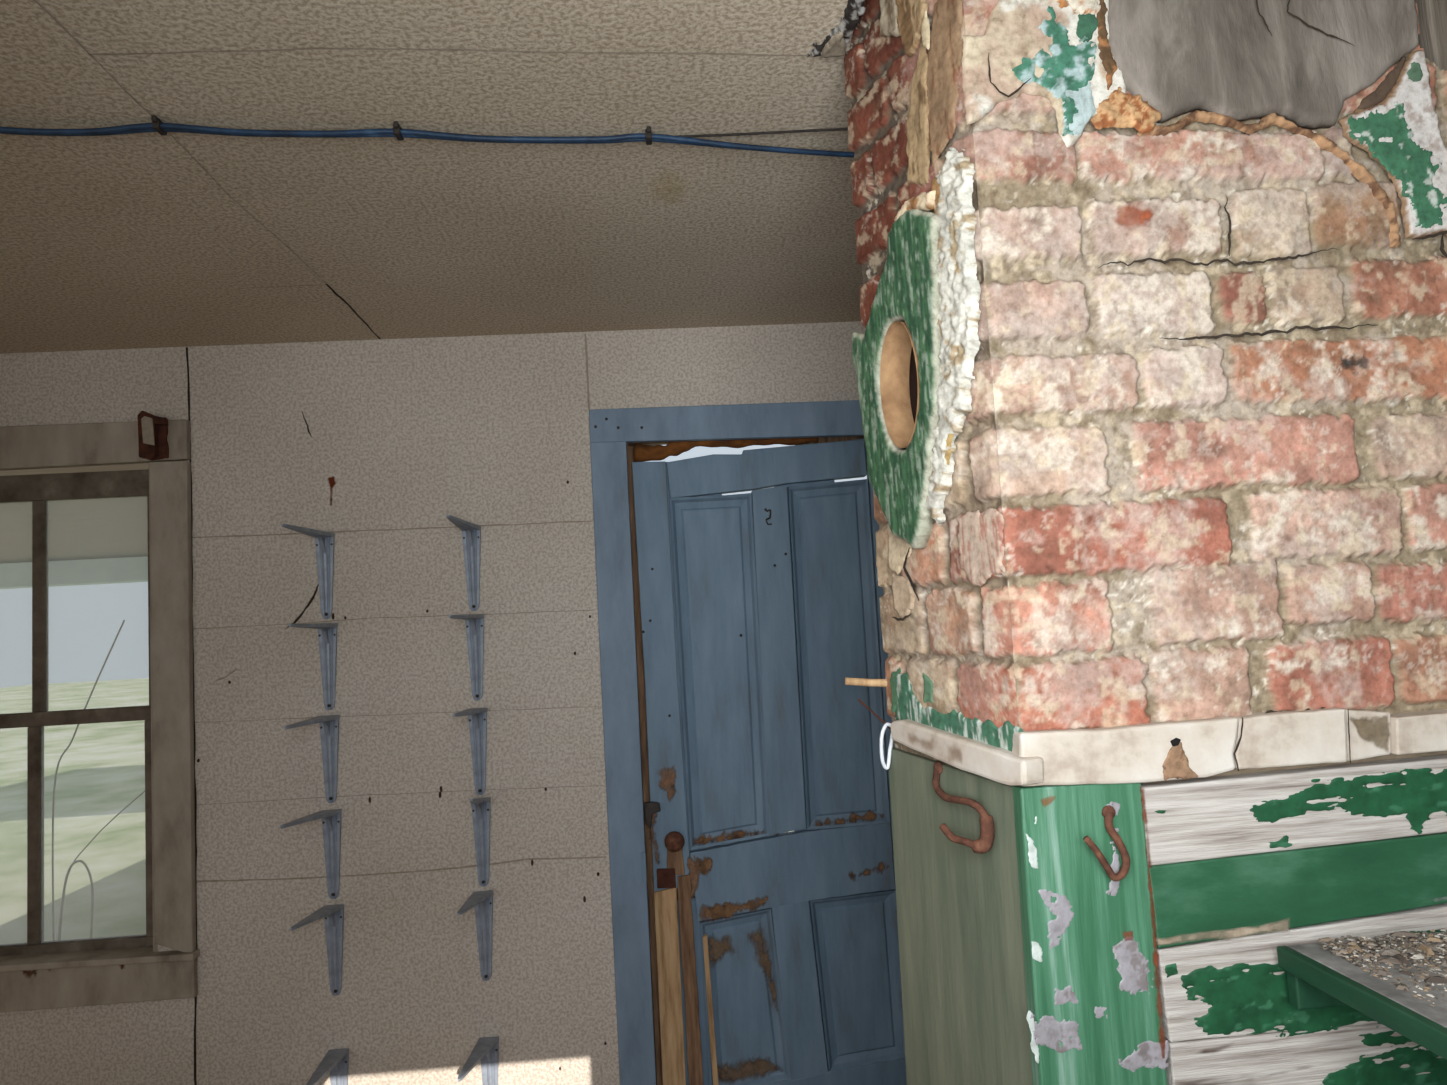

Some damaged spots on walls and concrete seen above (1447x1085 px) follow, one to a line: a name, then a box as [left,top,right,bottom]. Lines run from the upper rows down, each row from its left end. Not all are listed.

crack [1256,0,1354,46]
crack [34,0,823,339]
crack [1099,196,1336,268]
flaking render [879,0,1447,586]
crack [1163,324,1377,340]
crack [186,347,607,949]
spalling [1162,738,1198,781]
peeling [1250,768,1447,848]
peeling [1032,889,1074,962]
crack [191,996,199,1085]
peeling [1027,985,1083,1063]
peeling [1113,938,1447,1085]